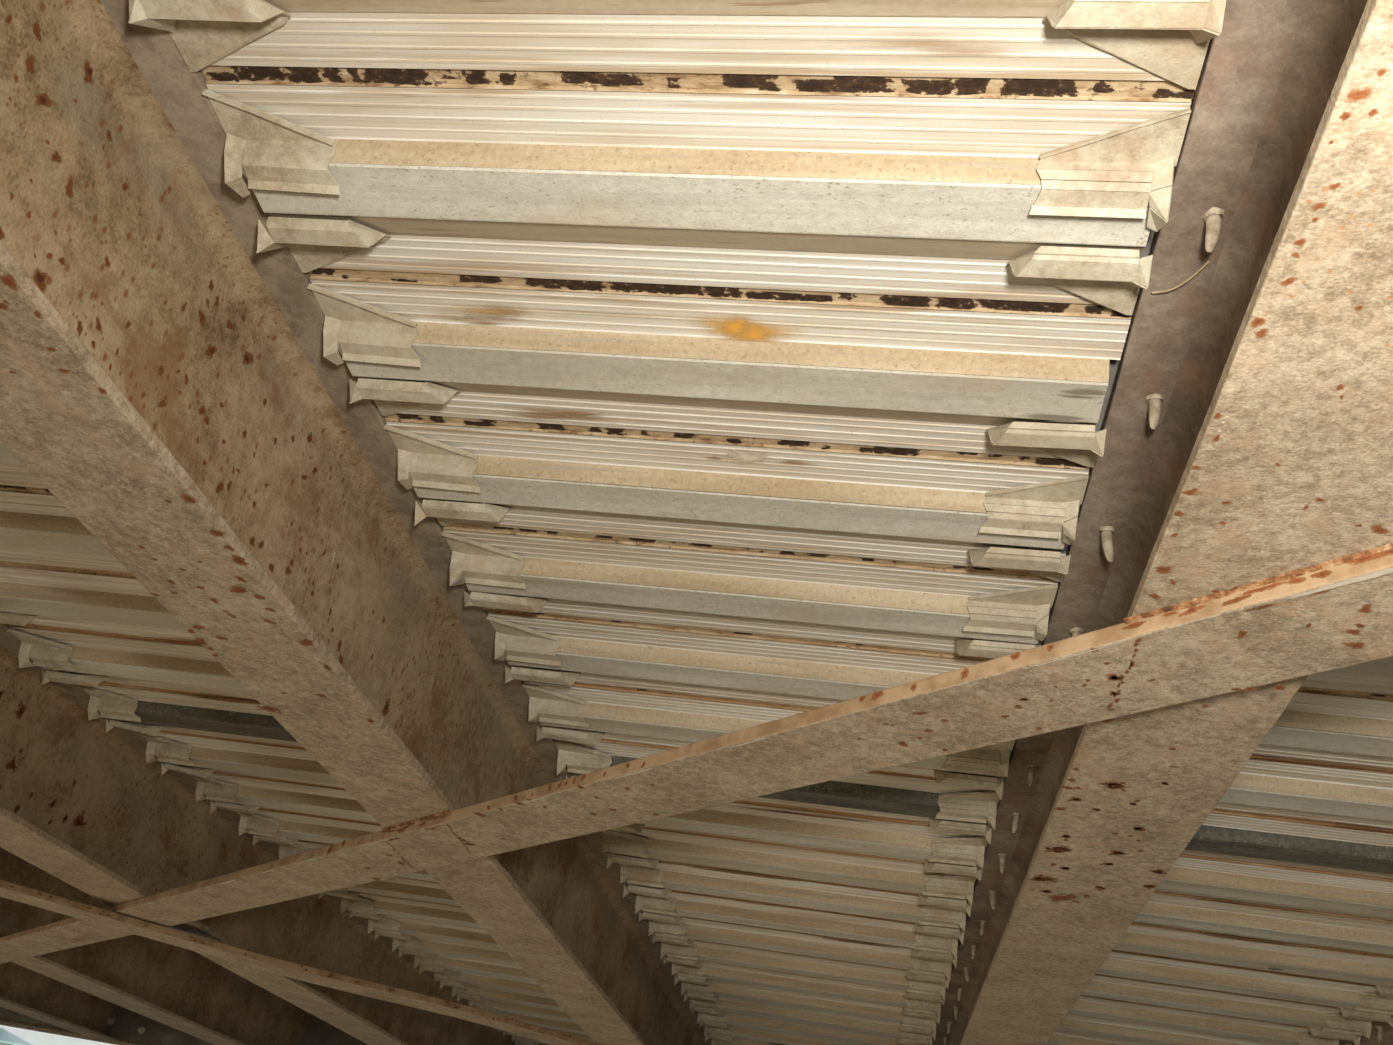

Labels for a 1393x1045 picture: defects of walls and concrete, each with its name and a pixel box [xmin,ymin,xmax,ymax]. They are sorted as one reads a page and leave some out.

corrosion [9,23,42,101]
corrosion [84,61,93,84]
corrosion [1312,183,1340,222]
corrosion [0,275,17,310]
corrosion [34,253,65,294]
corrosion [77,302,103,348]
corrosion [710,320,780,340]
corrosion [519,411,599,420]
corrosion [196,530,276,624]
corrosion [1091,524,1393,723]
corrosion [1100,782,1140,805]
corrosion [1029,834,1105,903]